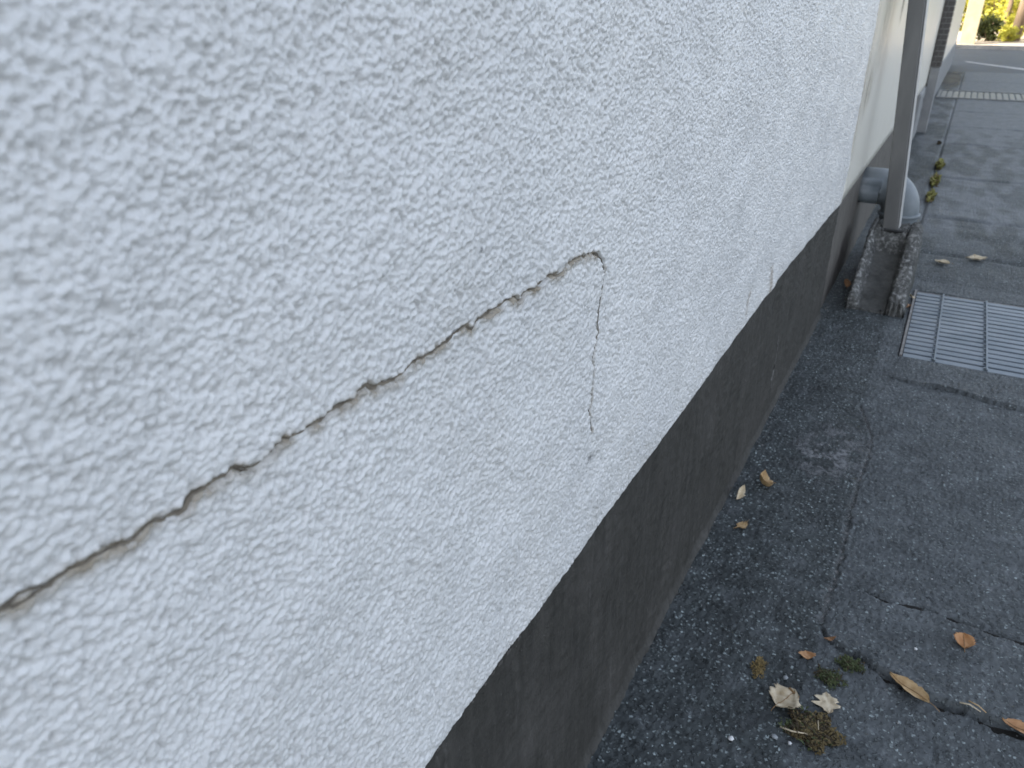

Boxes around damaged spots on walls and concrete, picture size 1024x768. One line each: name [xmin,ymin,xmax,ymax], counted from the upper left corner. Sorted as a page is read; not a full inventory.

crack [0,252,604,615]